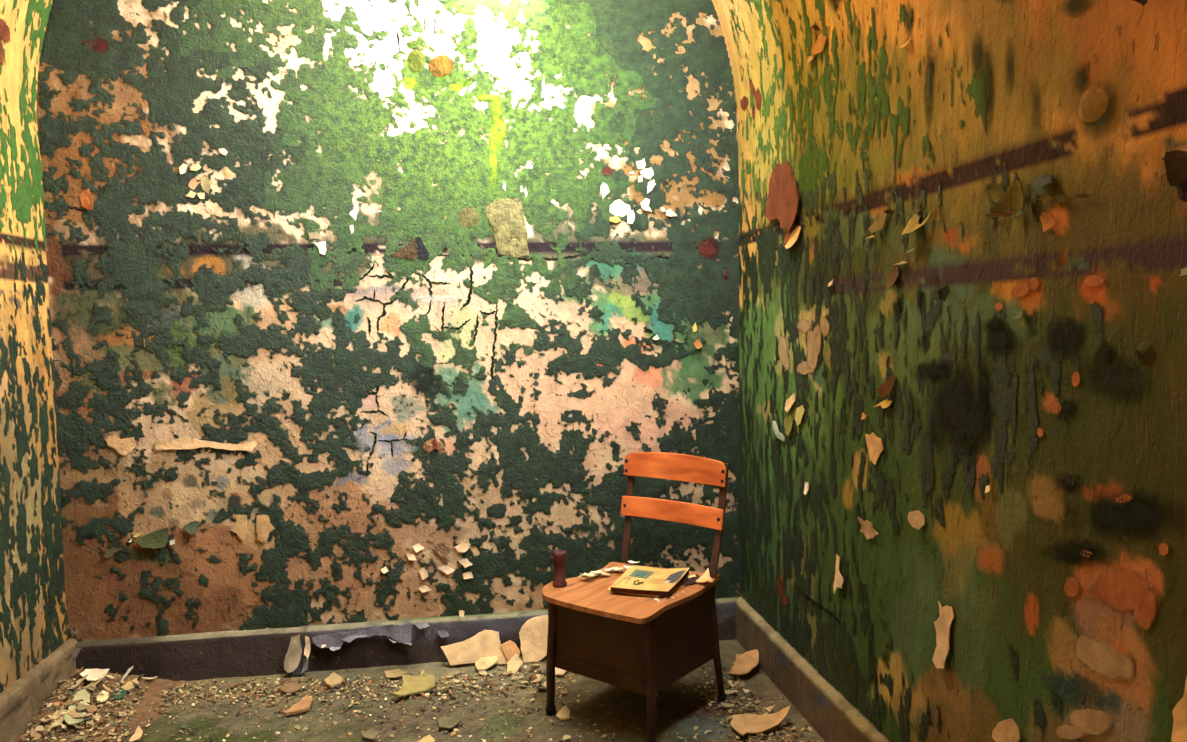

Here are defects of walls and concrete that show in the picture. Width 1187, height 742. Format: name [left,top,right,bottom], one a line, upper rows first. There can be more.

crack [396,16,436,51]
peeling [179,163,211,199]
peeling [600,158,677,224]
peeling [765,161,801,249]
crack [354,250,670,380]
peeling [154,438,257,452]
crack [362,386,411,477]
peeling [772,393,805,441]
peeling [406,532,473,593]
peeling [284,622,449,678]
peeling [932,601,955,669]
peeling [721,649,796,742]